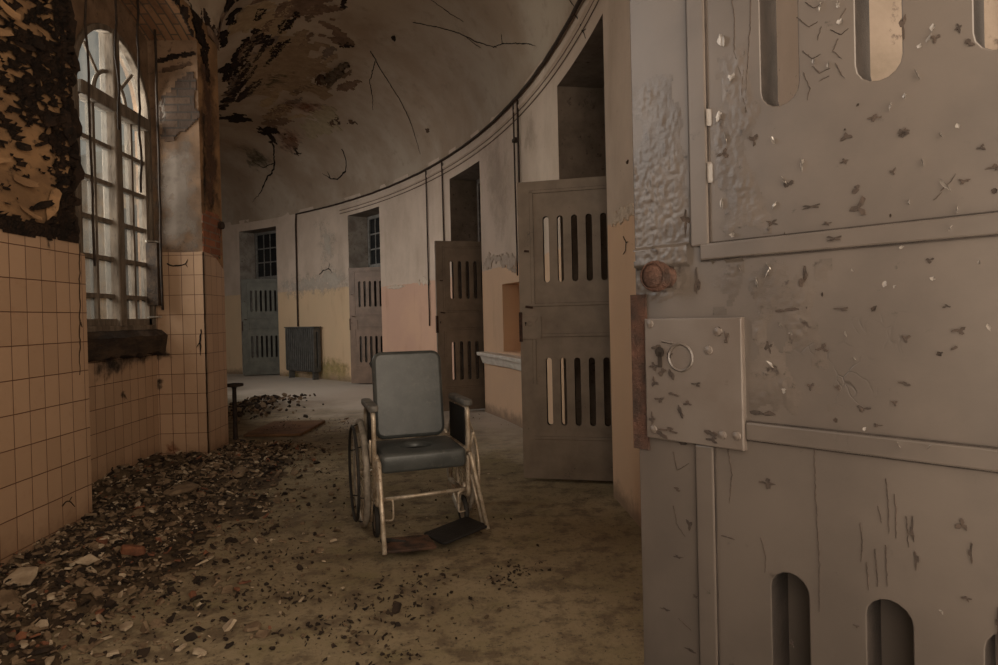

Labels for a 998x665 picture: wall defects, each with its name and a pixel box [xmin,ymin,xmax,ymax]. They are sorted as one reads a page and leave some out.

crack [413,0,534,48]
peeling [0,0,85,244]
spalling [157,0,362,156]
crack [255,126,275,197]
crack [369,51,420,152]